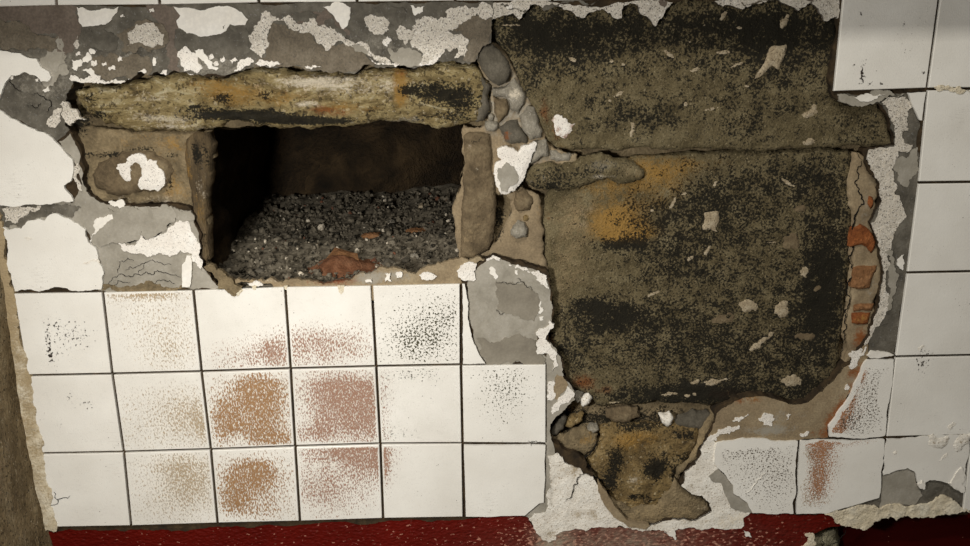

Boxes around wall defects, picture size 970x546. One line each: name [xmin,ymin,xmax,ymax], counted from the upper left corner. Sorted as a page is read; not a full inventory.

flaking render [714,0,840,28]
flaking render [0,0,672,297]
crack [108,223,179,285]
flaking render [457,89,970,546]
rust [207,370,402,521]
rust [803,440,868,505]